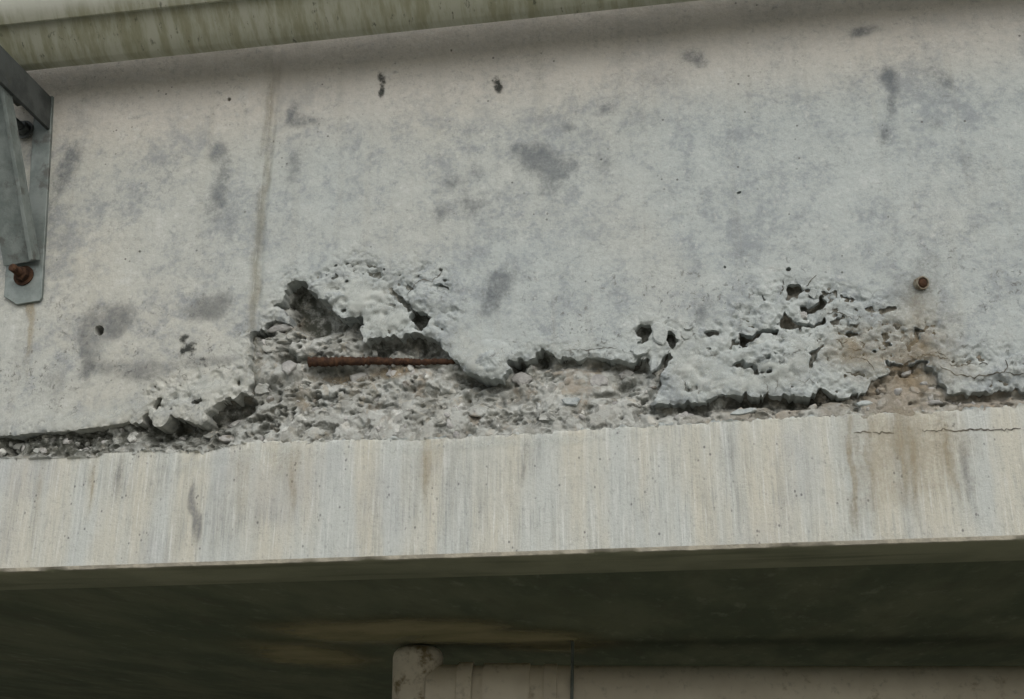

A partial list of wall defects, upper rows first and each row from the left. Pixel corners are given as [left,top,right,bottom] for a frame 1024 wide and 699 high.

spalling [127,263,1024,455]
crack [855,429,894,437]
crack [922,426,1021,434]